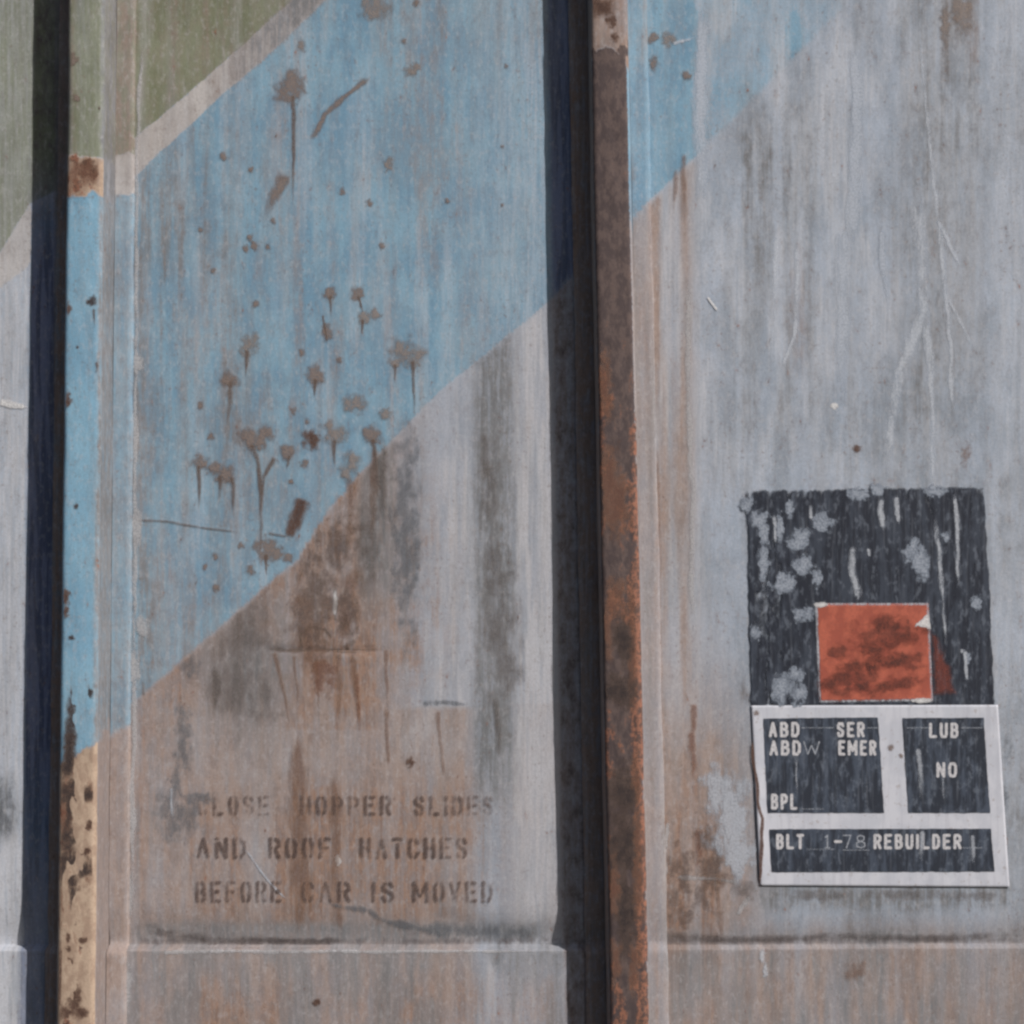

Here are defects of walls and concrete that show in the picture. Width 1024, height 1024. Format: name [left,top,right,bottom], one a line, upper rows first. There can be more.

rust [270,70,305,203]
rust [238,420,358,510]
peeling [846,482,887,502]
rust [286,498,309,536]
peeling [739,495,835,624]
peeling [901,537,930,583]
peeling [915,615,931,629]
peeling [970,594,982,610]
peeling [770,666,808,708]
rust [61,692,93,911]
rust [609,759,642,984]
rust [60,989,89,1019]